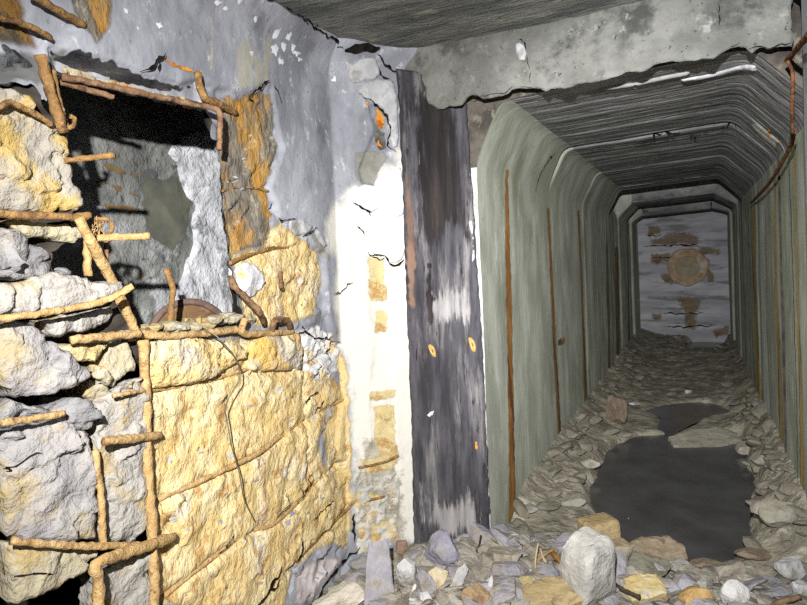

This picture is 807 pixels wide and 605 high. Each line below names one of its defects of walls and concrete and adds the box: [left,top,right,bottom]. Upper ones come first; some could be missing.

peeling [345,58,399,150]
crack [475,31,543,97]
peeling [600,65,757,90]
crack [731,41,790,49]
rust [218,91,321,327]
peeling [352,167,405,263]
crack [353,202,404,266]
damp [410,90,470,248]
peeling [0,49,344,605]
damp [426,263,435,325]
rust [505,170,516,522]
rust [151,338,398,605]